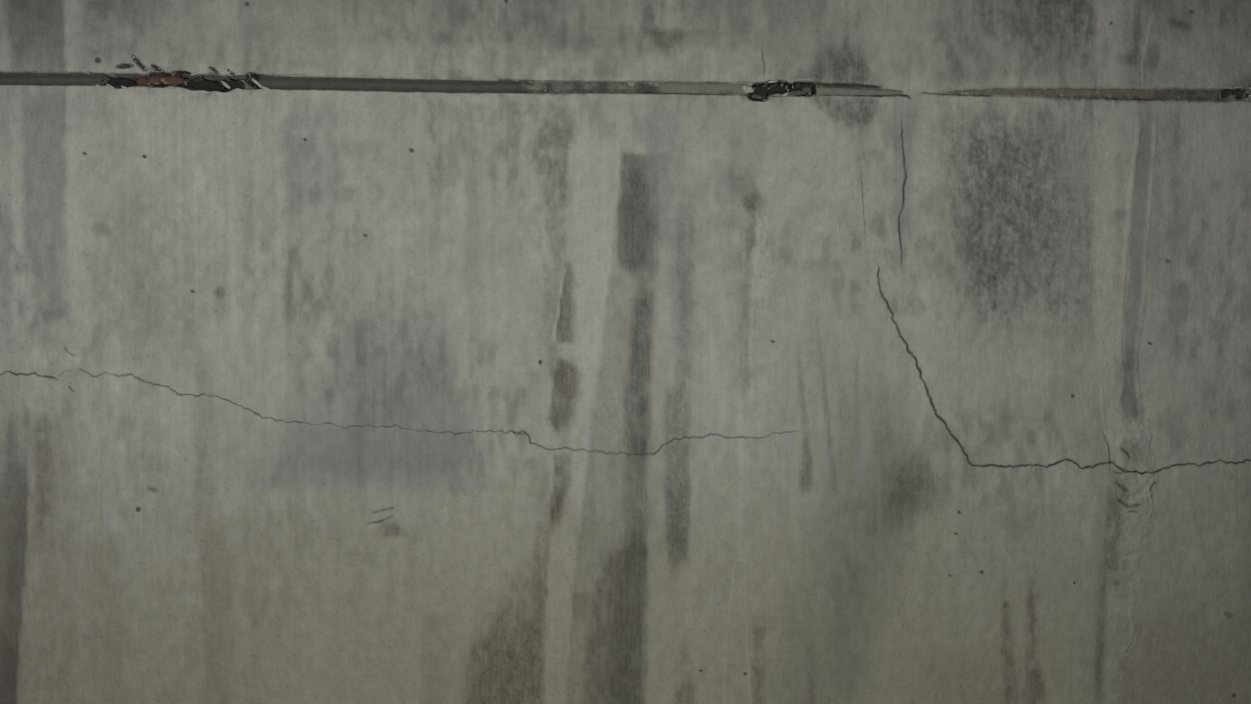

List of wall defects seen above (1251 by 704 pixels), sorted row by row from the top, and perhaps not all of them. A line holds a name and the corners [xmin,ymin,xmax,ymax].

corrosion [136,76,184,86]
spalling [95,55,271,96]
spalling [742,80,817,102]
crack [813,83,986,98]
spalling [1221,86,1251,100]
crack [877,133,1250,474]